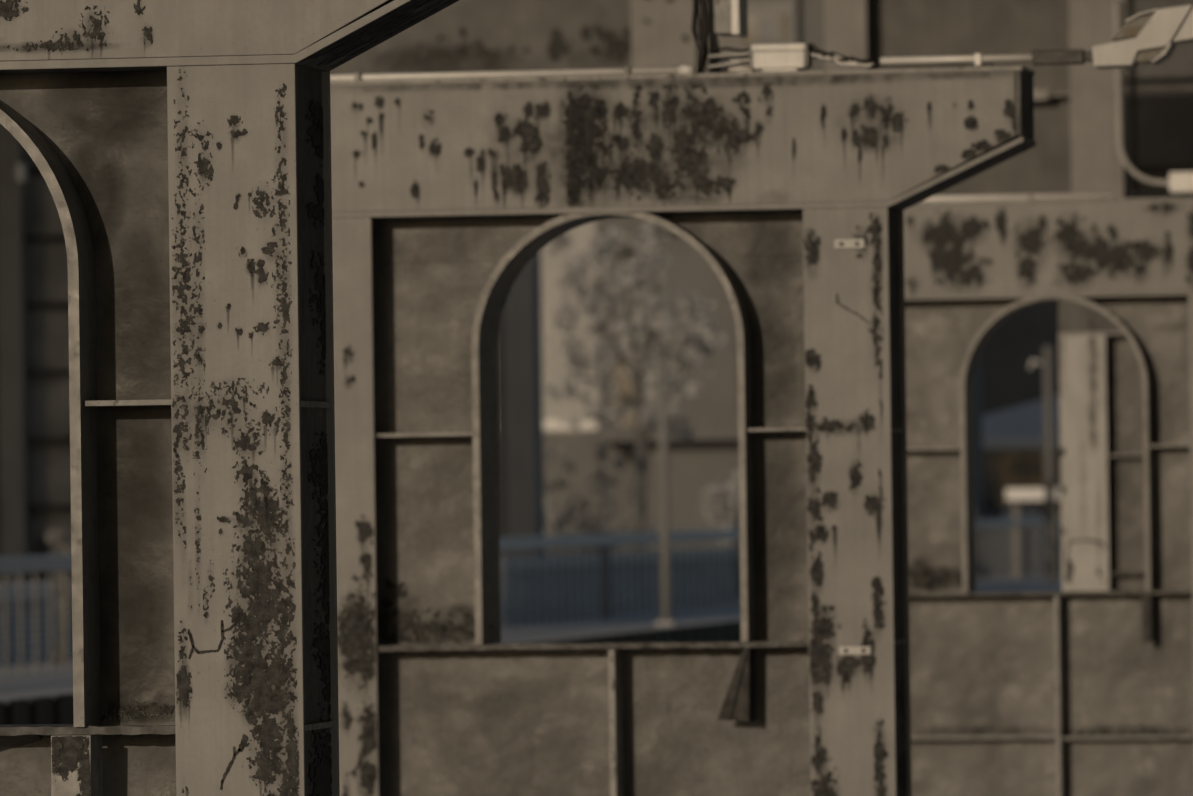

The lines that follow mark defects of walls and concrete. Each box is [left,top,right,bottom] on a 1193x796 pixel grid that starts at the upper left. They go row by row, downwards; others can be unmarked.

rust [352,96,400,159]
rust [418,109,442,157]
rust [465,79,775,207]
rust [840,96,908,161]
rust [954,99,1015,160]
rust [410,179,420,199]
rust [907,202,1193,288]
rust [171,69,293,618]
rust [803,212,888,796]
rust [377,570,475,643]
rust [101,620,192,721]
rust [51,736,90,796]